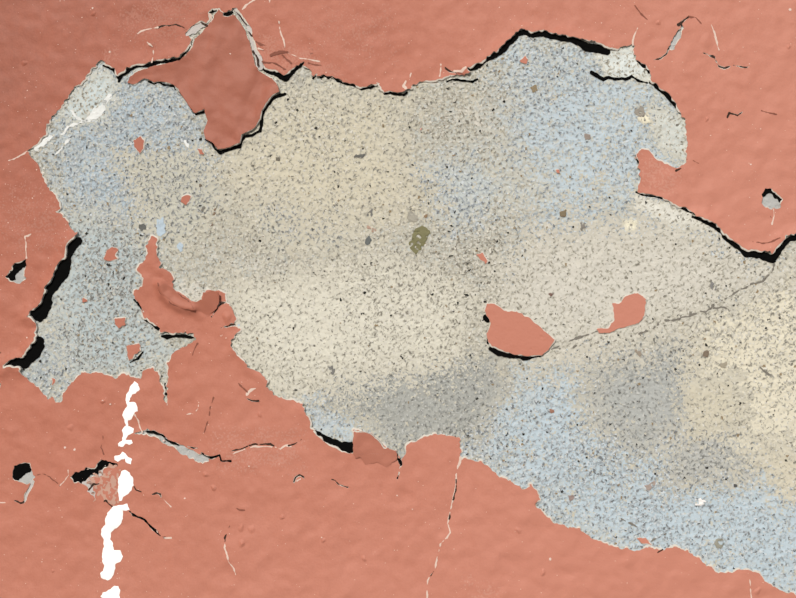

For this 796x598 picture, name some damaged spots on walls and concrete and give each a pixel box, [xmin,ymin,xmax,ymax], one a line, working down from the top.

spalling [654,15,690,60]
spalling [762,188,783,209]
spalling [5,259,27,284]
spalling [134,428,219,463]
crack [134,413,302,462]
spalling [12,462,35,502]
spalling [70,460,118,484]
spalling [767,453,796,511]
crack [88,483,172,539]
crack [426,456,462,598]